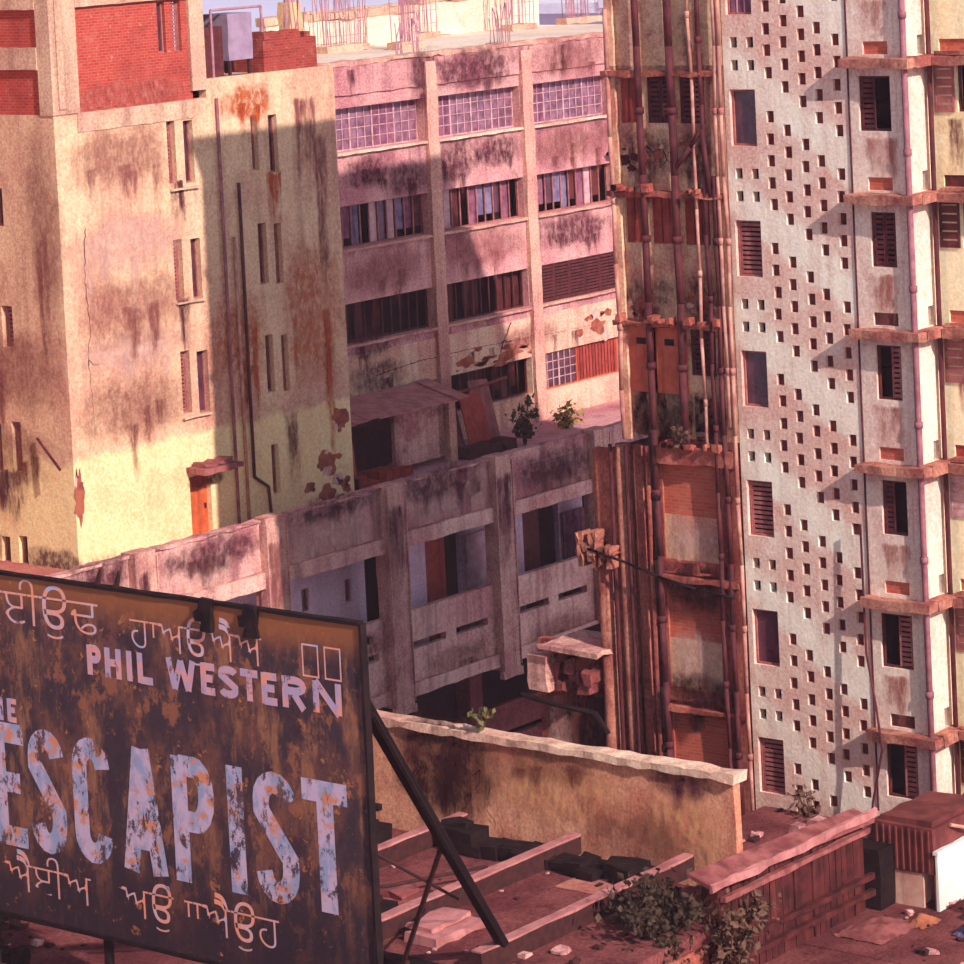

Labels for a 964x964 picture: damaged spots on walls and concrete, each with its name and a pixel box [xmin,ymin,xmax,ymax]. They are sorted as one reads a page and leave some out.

corrosion [221,88,268,123]
water stain [87,139,149,189]
water stain [348,158,426,197]
corrosion [287,251,340,415]
peeling [455,343,532,372]
peeling [576,308,612,341]
water stain [111,392,164,455]
spalling [332,408,349,432]
water stain [0,439,39,512]
flaking render [304,449,351,501]
spalling [536,641,604,695]
water stain [400,707,718,859]